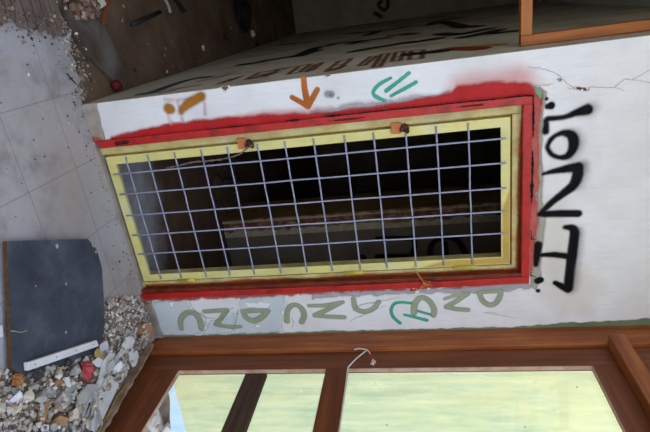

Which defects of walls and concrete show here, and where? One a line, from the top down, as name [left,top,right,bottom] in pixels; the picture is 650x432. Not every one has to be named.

crack [323,67,650,204]